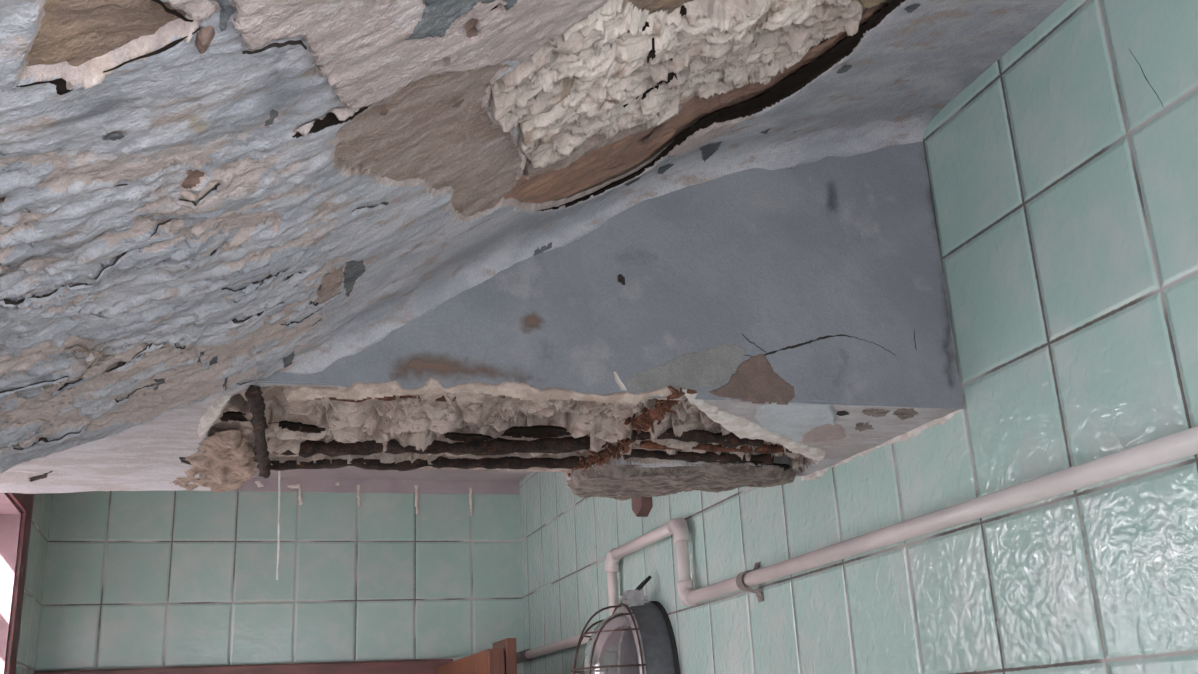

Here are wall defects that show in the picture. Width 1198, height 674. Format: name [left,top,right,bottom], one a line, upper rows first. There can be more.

crack [242,40,307,54]
spalling [16,0,921,217]
crack [642,74,677,99]
crack [0,183,225,309]
crack [210,267,341,328]
crack [0,342,185,404]
crack [742,329,917,357]
crack [0,426,88,452]
spalling [169,342,918,501]